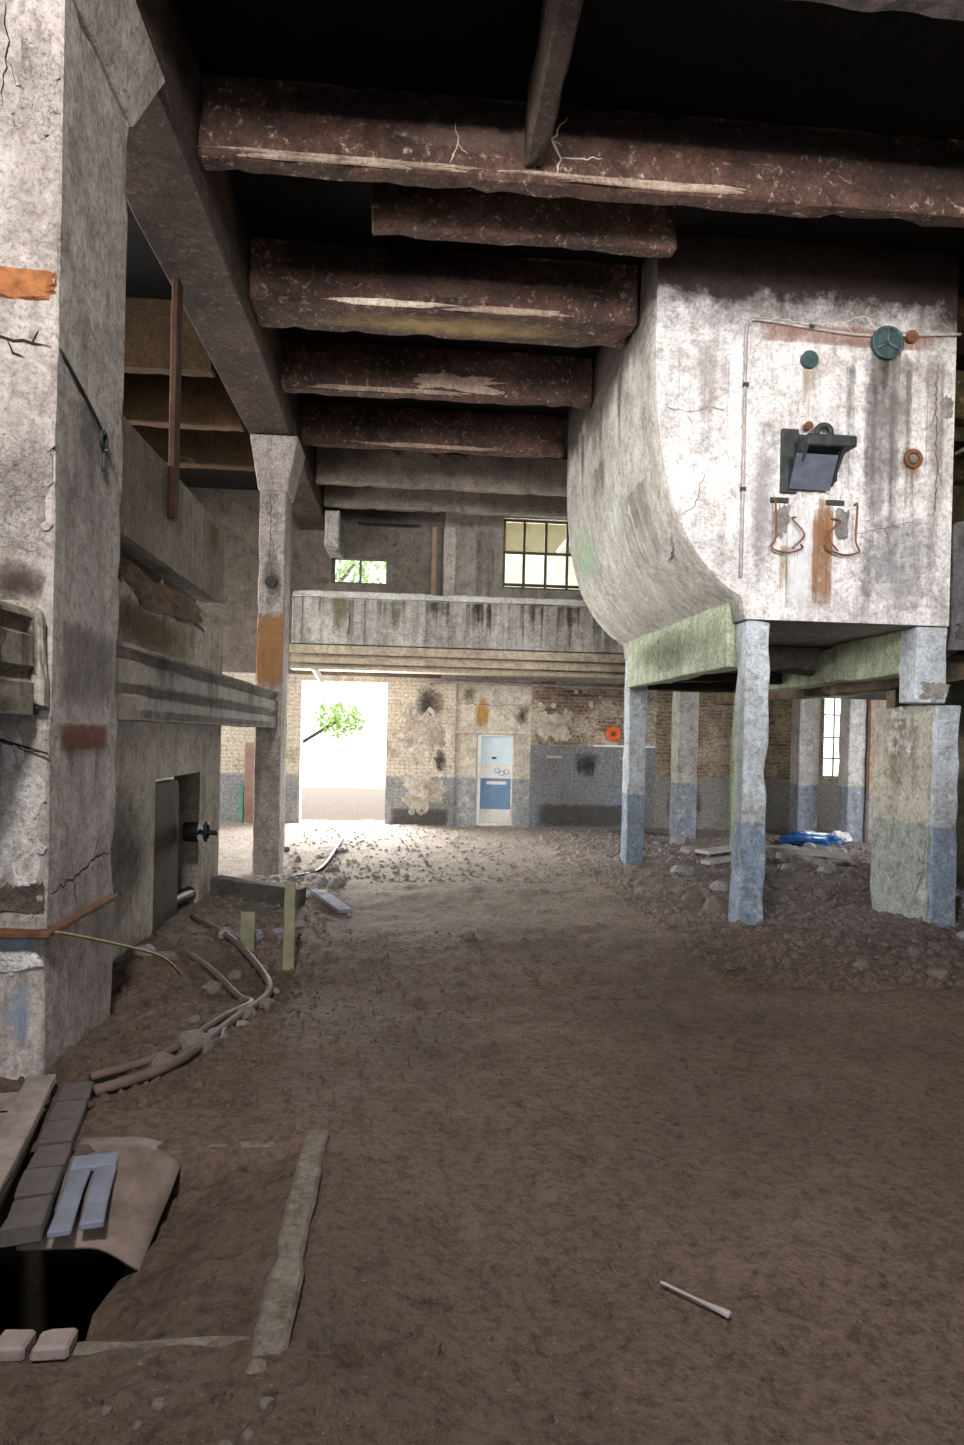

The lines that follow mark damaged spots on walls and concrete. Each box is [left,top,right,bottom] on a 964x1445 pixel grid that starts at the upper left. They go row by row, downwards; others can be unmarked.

crack [0,329,120,486]
damp [319,599,353,634]
damp [469,531,494,625]
damp [531,606,595,642]
rust [812,499,833,602]
flaking render [391,702,453,815]
flaking render [534,681,596,742]